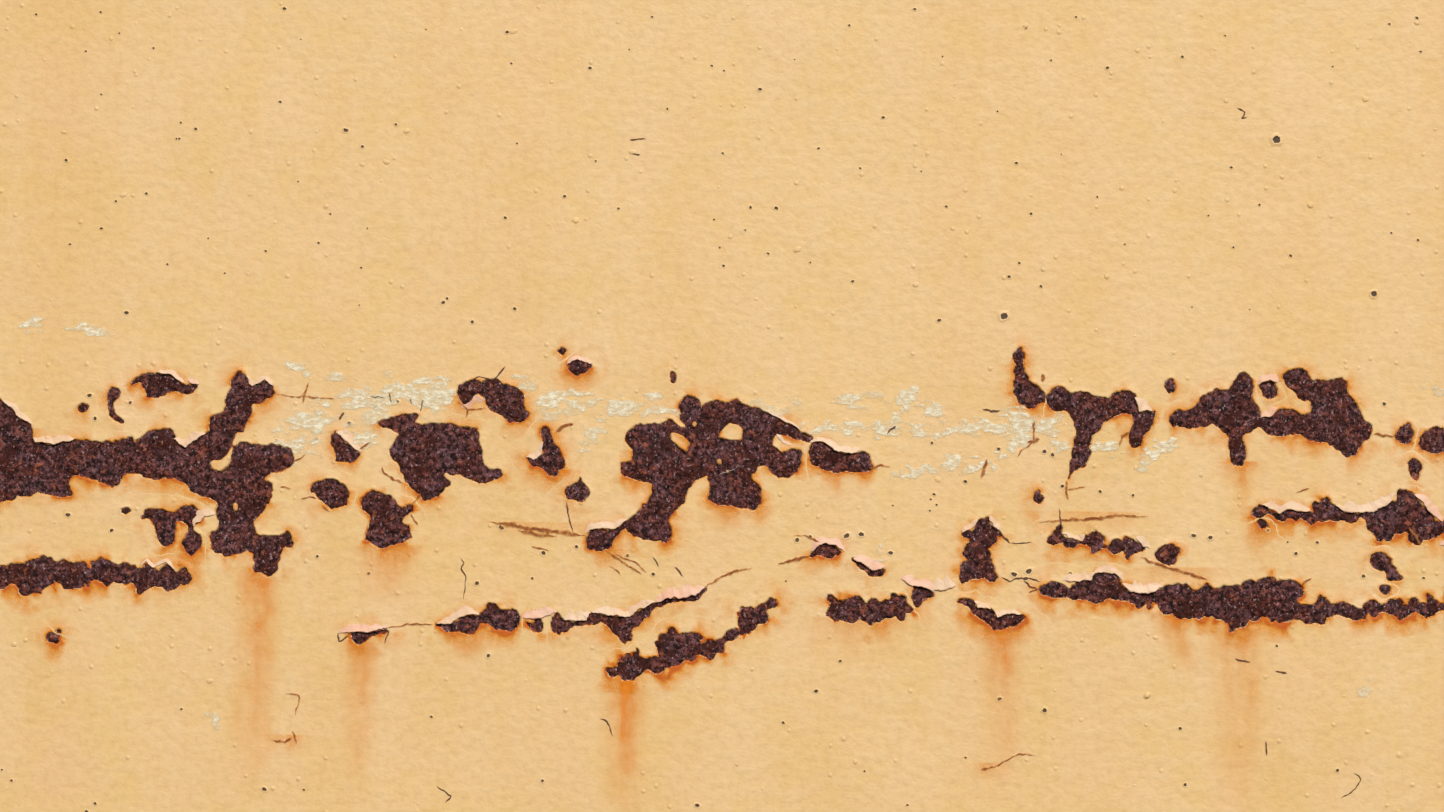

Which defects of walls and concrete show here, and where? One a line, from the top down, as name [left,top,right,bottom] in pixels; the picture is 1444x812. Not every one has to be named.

rust [0,369,297,602]
rust [309,379,590,556]
rust [583,394,874,557]
rust [805,516,1030,660]
rust [1008,346,1373,481]
rust [1032,422,1444,641]